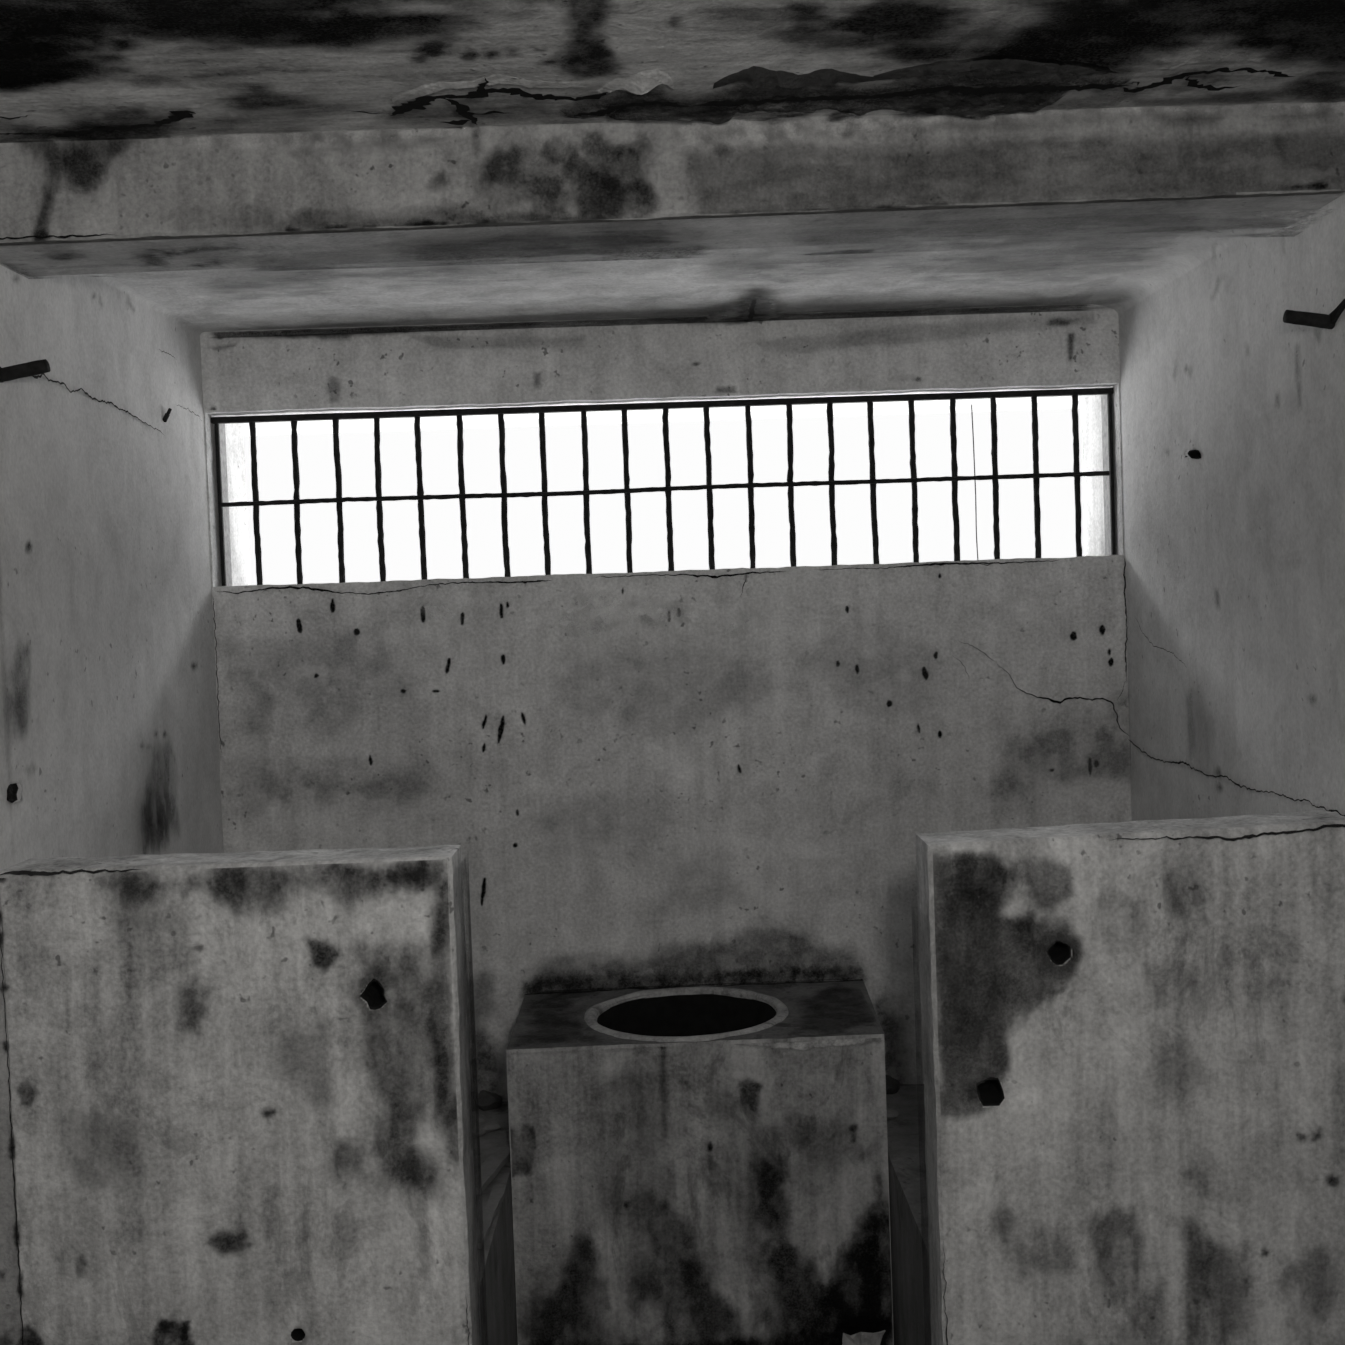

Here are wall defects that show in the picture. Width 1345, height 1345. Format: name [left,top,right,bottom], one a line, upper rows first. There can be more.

crack [0,110,196,137]
water stain [0,0,474,91]
crack [347,73,608,125]
spalling [562,57,1136,124]
water stain [733,0,1345,108]
crack [1120,56,1295,93]
water stain [488,136,652,219]
crack [32,373,202,434]
crack [956,642,1345,841]
water stain [933,854,1081,1115]
water stain [190,860,491,1345]
water stain [665,1163,893,1345]